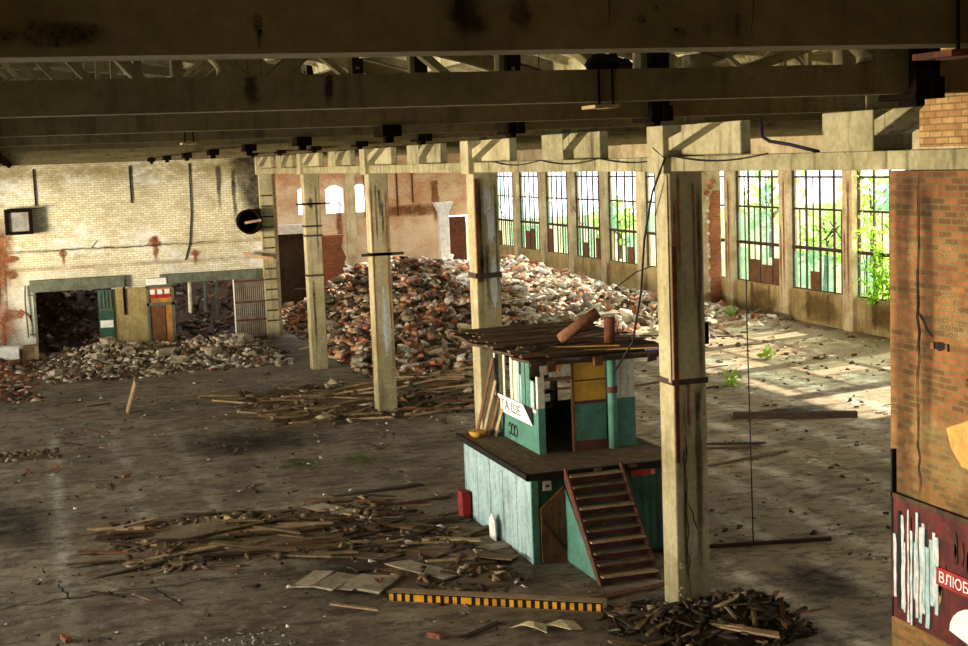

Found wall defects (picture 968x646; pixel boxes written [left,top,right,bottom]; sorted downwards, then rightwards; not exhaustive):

corrosion [0,231,23,346]